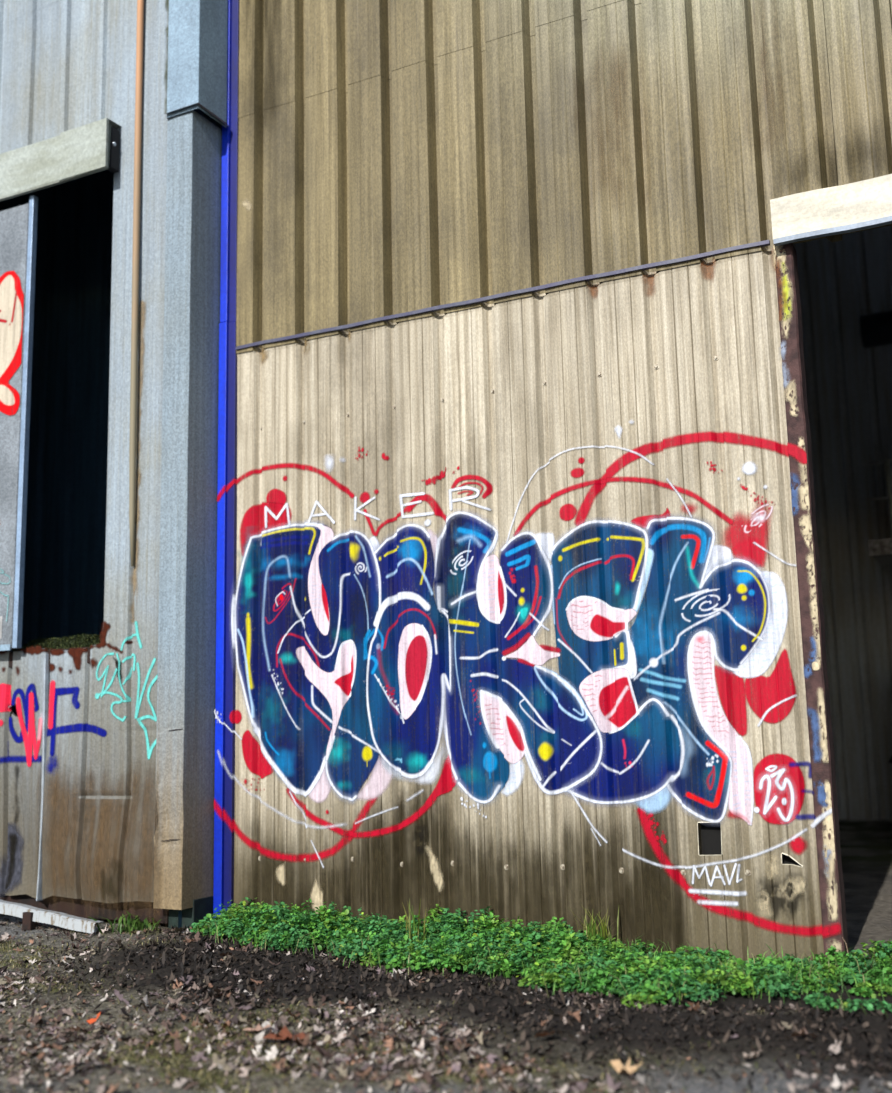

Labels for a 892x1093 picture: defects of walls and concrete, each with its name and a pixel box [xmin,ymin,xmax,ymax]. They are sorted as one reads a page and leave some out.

rust [0,622,132,673]
leakage [0,815,24,896]